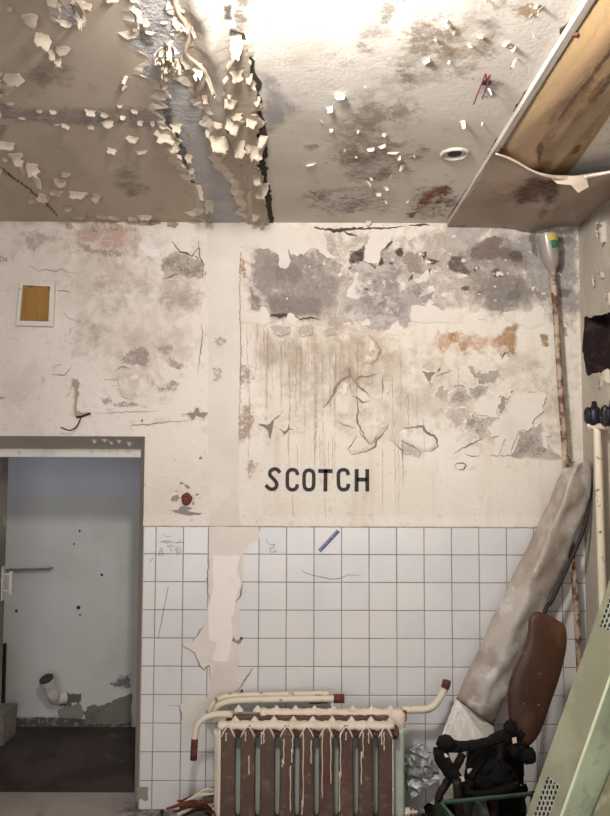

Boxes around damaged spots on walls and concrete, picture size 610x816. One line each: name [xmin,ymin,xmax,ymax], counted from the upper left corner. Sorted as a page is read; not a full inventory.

damp [410,24,458,55]
peeling [153,123,194,175]
peeling [192,36,270,229]
damp [334,103,406,180]
crack [0,168,57,216]
flaking render [326,252,463,337]
rust [438,324,518,355]
flaking render [581,204,610,419]
damp [238,406,253,439]
crack [323,335,483,470]
peeling [420,365,576,465]
flaking render [57,691,133,726]